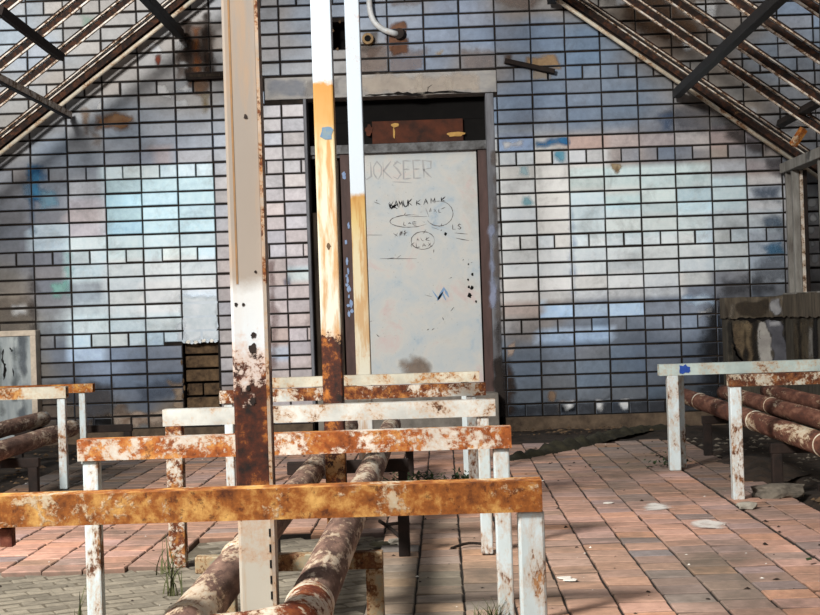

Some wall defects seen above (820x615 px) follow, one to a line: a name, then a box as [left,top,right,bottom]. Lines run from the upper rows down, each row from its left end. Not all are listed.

leakage [402,358,429,373]